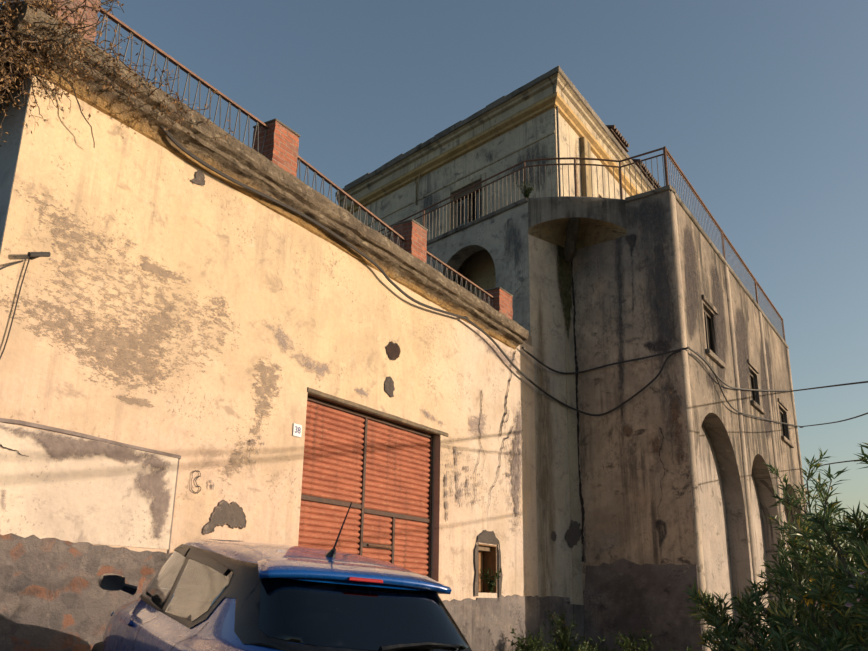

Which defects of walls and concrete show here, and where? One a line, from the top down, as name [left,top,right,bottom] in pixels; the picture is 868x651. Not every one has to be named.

flaking render [191,170,205,186]
leakage [4,428,170,538]
flaking render [201,499,247,535]
flaking render [385,376,395,397]
crack [472,350,516,515]
leakage [556,245,573,338]
flaking render [551,520,587,574]
crack [571,260,585,562]
leakage [616,202,676,420]
leakage [684,225,699,338]
leakage [706,266,773,440]